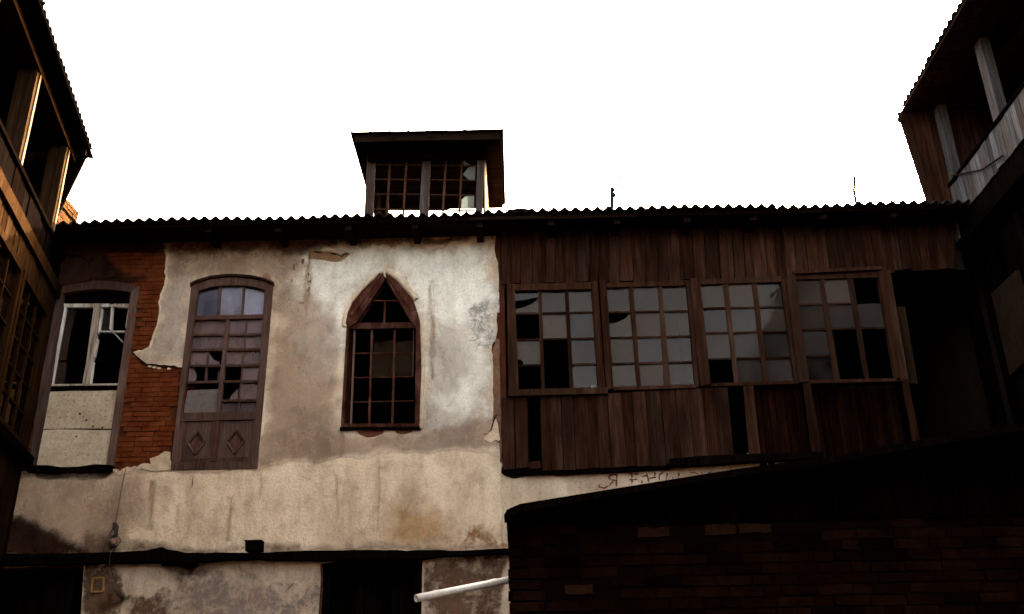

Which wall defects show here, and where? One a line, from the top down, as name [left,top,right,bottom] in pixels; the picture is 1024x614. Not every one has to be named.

flaking render [84,249,191,474]
flaking render [291,248,350,304]
damp [154,236,498,463]
damp [13,480,169,552]